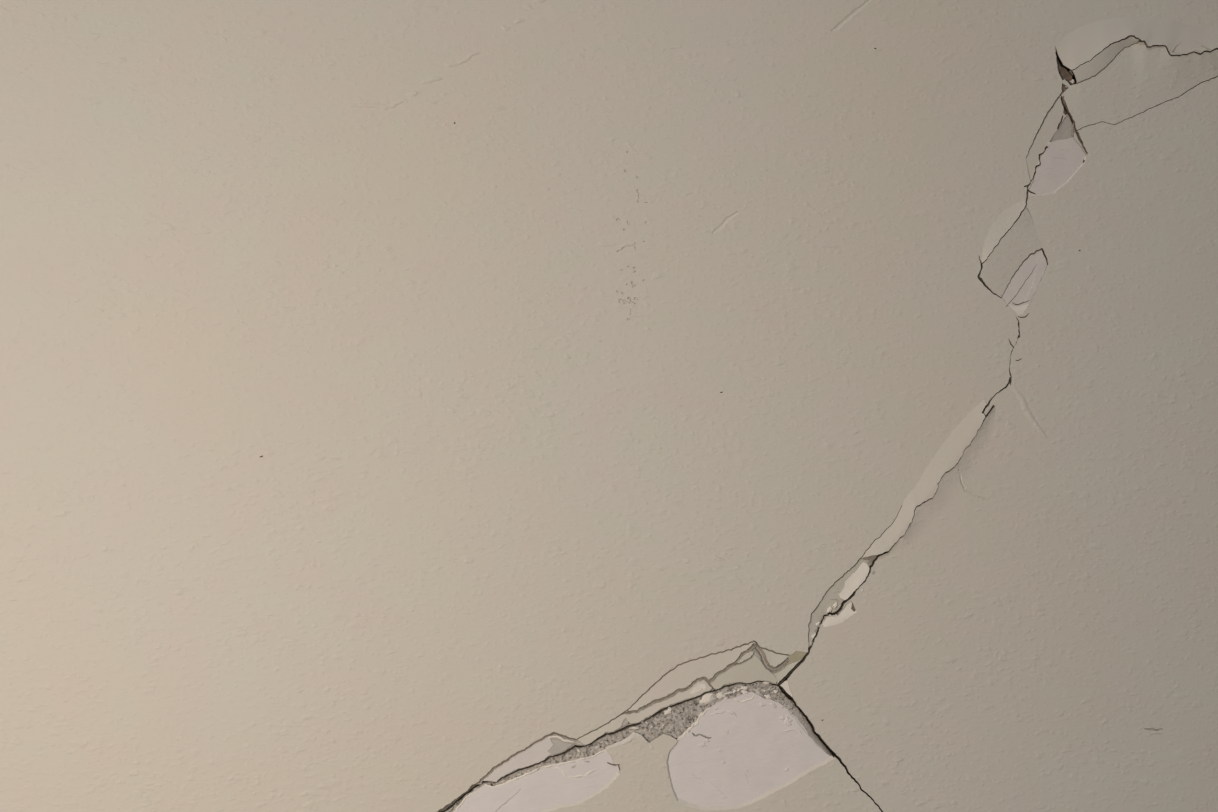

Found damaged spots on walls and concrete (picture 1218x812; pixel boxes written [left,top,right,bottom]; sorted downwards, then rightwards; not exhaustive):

peeling [1028,137,1086,197]
peeling [1001,248,1048,315]
crack [437,35,1218,812]
peeling [454,691,834,812]